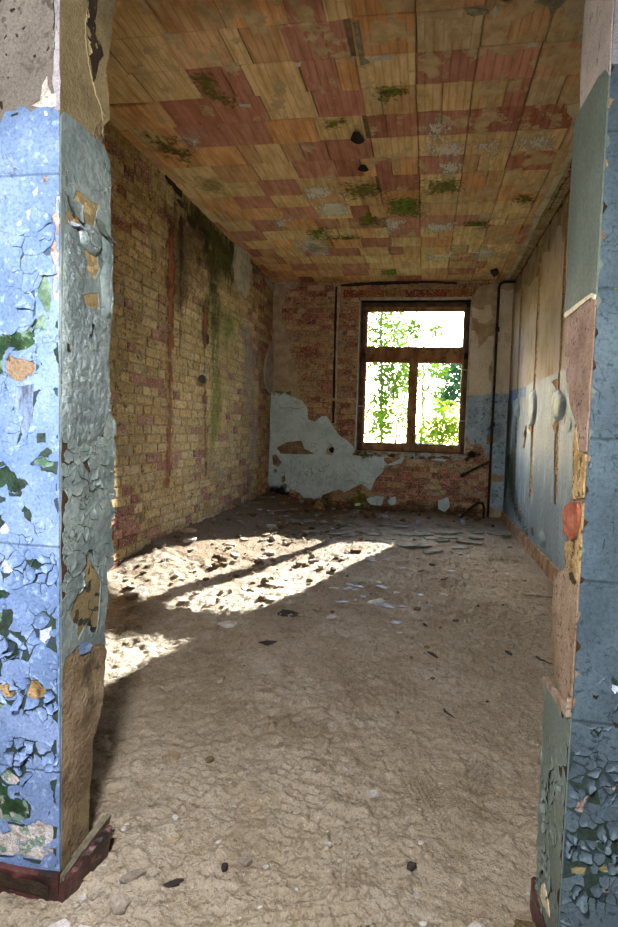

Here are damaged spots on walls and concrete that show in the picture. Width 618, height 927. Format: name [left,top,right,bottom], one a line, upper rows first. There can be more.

peeling [563,0,585,43]
peeling [0,194,118,386]
peeling [466,102,580,510]
peeling [0,465,21,494]
crack [0,210,117,868]
flaking render [272,441,314,493]
flaking render [533,293,602,718]
flaking render [0,555,106,868]
crack [531,683,618,927]